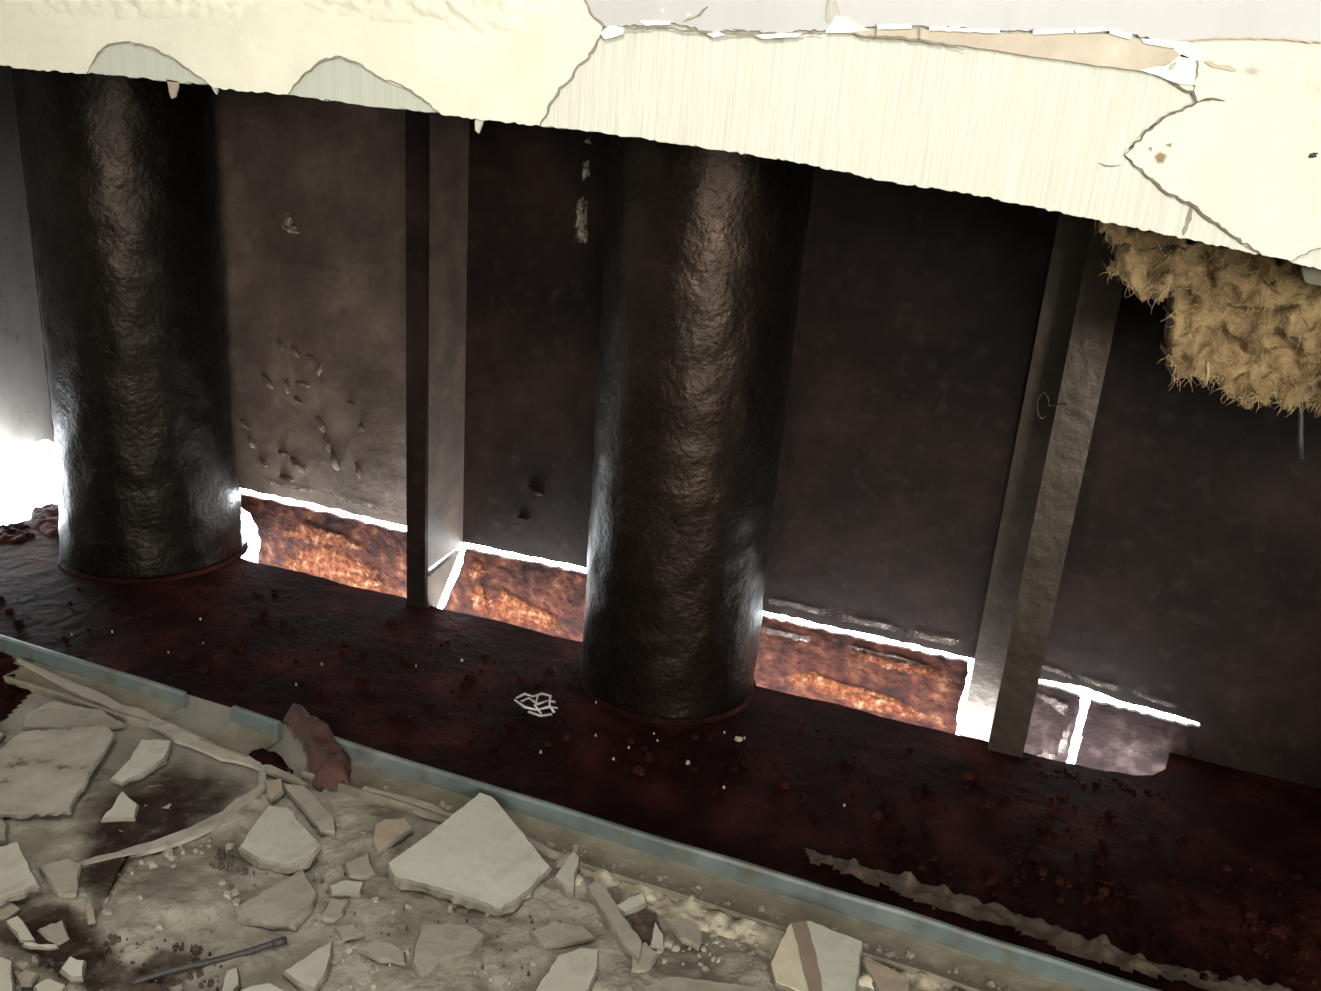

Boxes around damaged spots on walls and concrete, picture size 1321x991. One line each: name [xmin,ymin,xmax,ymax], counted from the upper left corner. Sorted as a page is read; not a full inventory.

peeling [640,8,671,26]
peeling [825,0,871,33]
peeling [929,26,1000,34]
peeling [0,0,605,126]
crack [1099,61,1321,261]
rust [283,523,384,592]
rust [468,562,556,630]
rust [851,648,937,679]
rust [786,671,924,719]